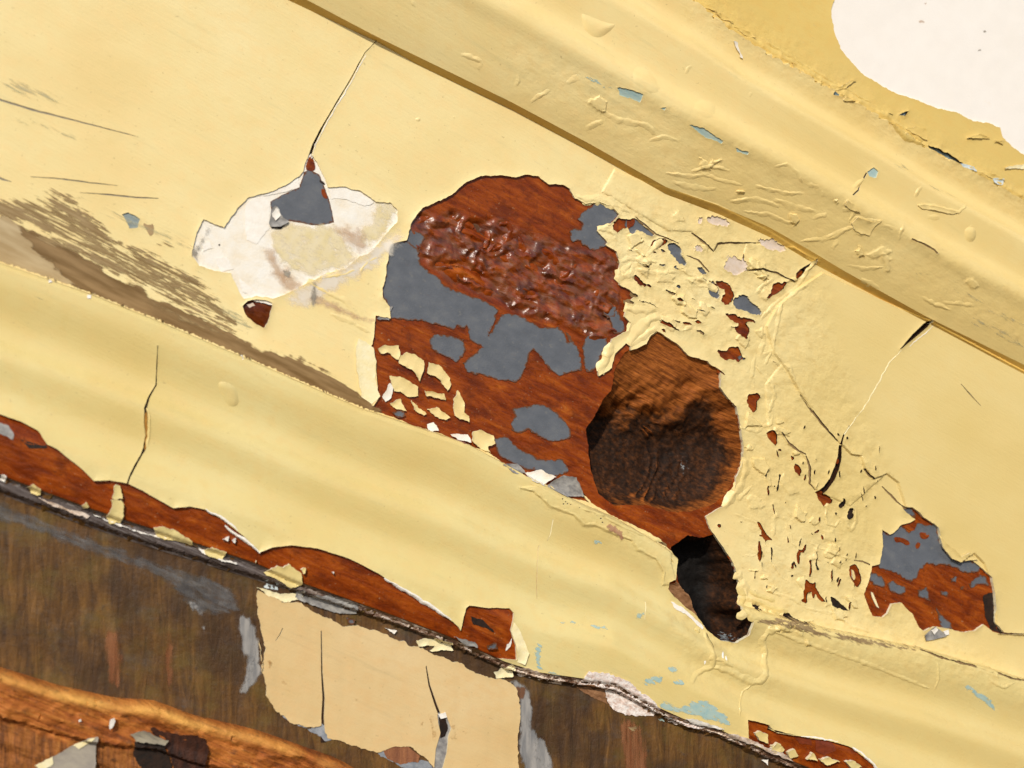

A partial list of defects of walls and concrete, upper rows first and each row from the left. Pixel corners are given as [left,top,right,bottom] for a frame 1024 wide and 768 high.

crack [309,40,377,158]
peeling [831,0,1024,185]
crack [128,346,158,481]
peeling [192,154,1022,641]
crack [781,321,933,532]
peeling [0,414,562,768]
peeling [577,671,877,768]